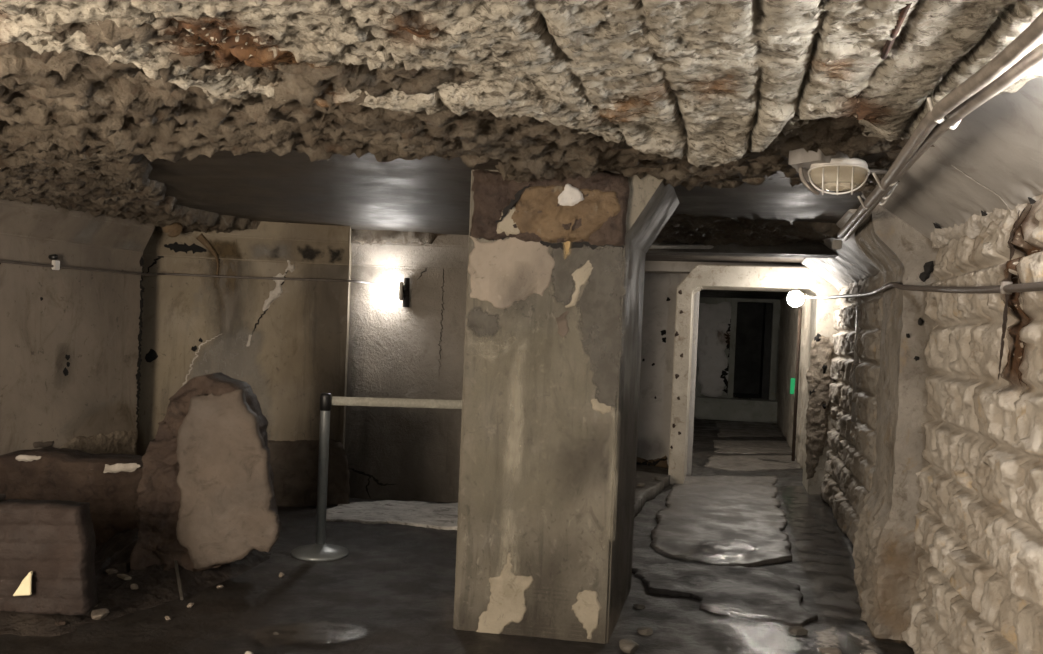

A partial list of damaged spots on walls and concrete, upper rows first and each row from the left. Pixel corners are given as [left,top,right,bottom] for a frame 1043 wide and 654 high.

rust [168,17,310,70]
crack [136,255,164,427]
spalling [466,170,630,640]